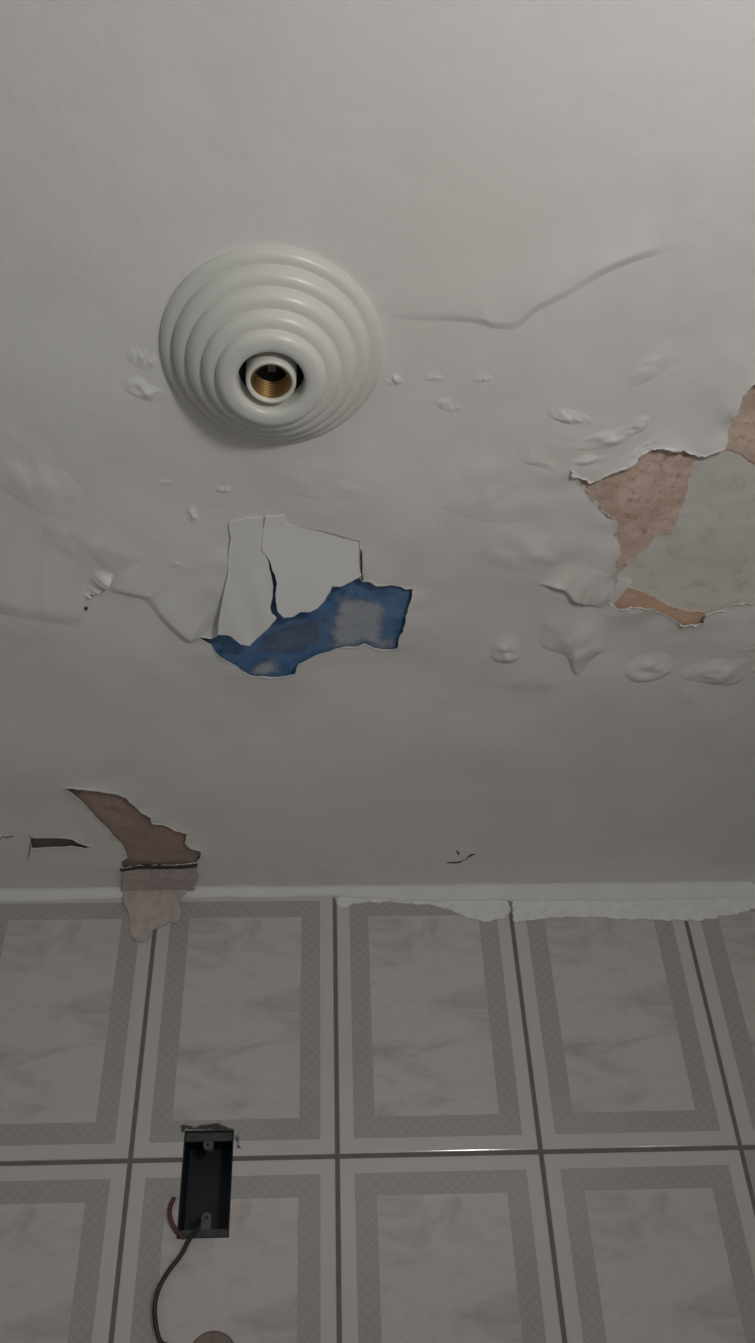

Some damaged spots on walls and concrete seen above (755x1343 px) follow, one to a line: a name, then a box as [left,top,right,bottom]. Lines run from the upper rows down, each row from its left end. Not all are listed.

peeling [568,380,755,628]
peeling [198,515,416,679]
peeling [31,838,88,848]
peeling [60,786,203,942]